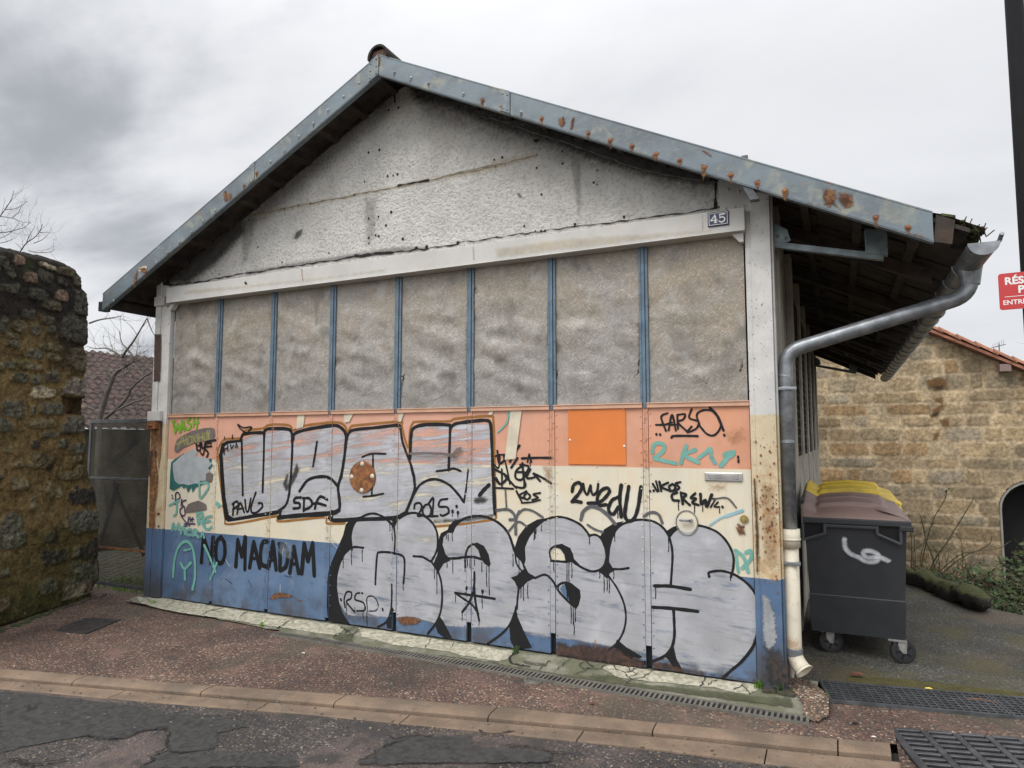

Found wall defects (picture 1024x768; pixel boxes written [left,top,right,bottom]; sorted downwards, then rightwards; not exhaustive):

crack [168,114,720,286]
rust [823,189,853,209]
peeling [755,441,782,558]
peeling [762,575,779,649]